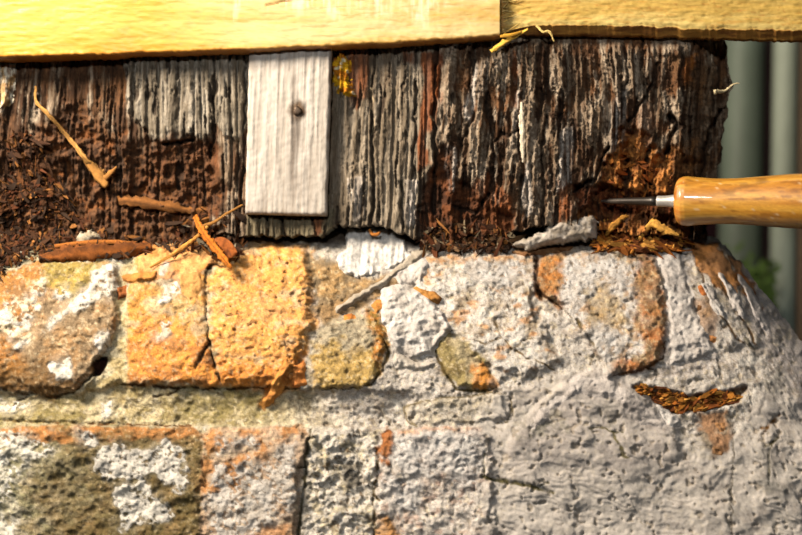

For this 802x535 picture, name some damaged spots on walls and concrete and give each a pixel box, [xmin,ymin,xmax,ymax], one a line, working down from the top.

crack [120,263,265,397]
crack [324,337,390,390]
crack [698,268,757,345]
crack [590,427,629,458]